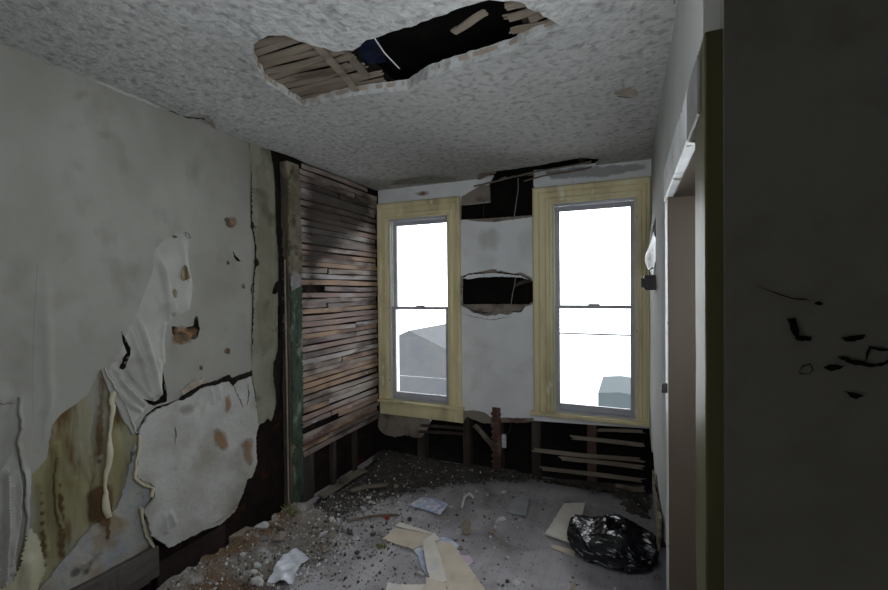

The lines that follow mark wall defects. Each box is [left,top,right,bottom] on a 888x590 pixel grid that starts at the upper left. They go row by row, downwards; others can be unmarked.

spalling [461,171,535,222]
spalling [461,269,533,316]
spalling [172,316,200,345]
peeling [787,318,811,341]
peeling [799,334,888,375]
spalling [378,413,430,438]
peeling [136,366,258,548]